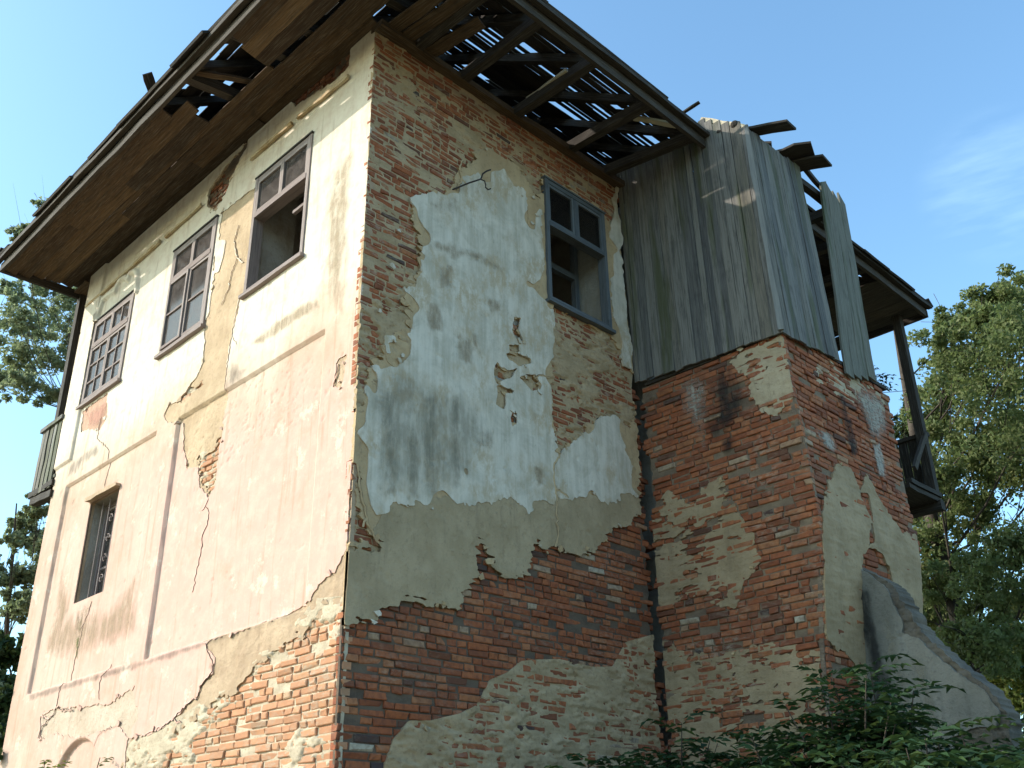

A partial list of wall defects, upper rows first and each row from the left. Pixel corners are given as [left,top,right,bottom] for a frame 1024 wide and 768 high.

flaking render [164,143,255,497]
flaking render [334,32,620,413]
crack [38,601,92,737]
crack [140,643,213,737]
crack [192,500,209,592]
flaking render [39,302,666,768]